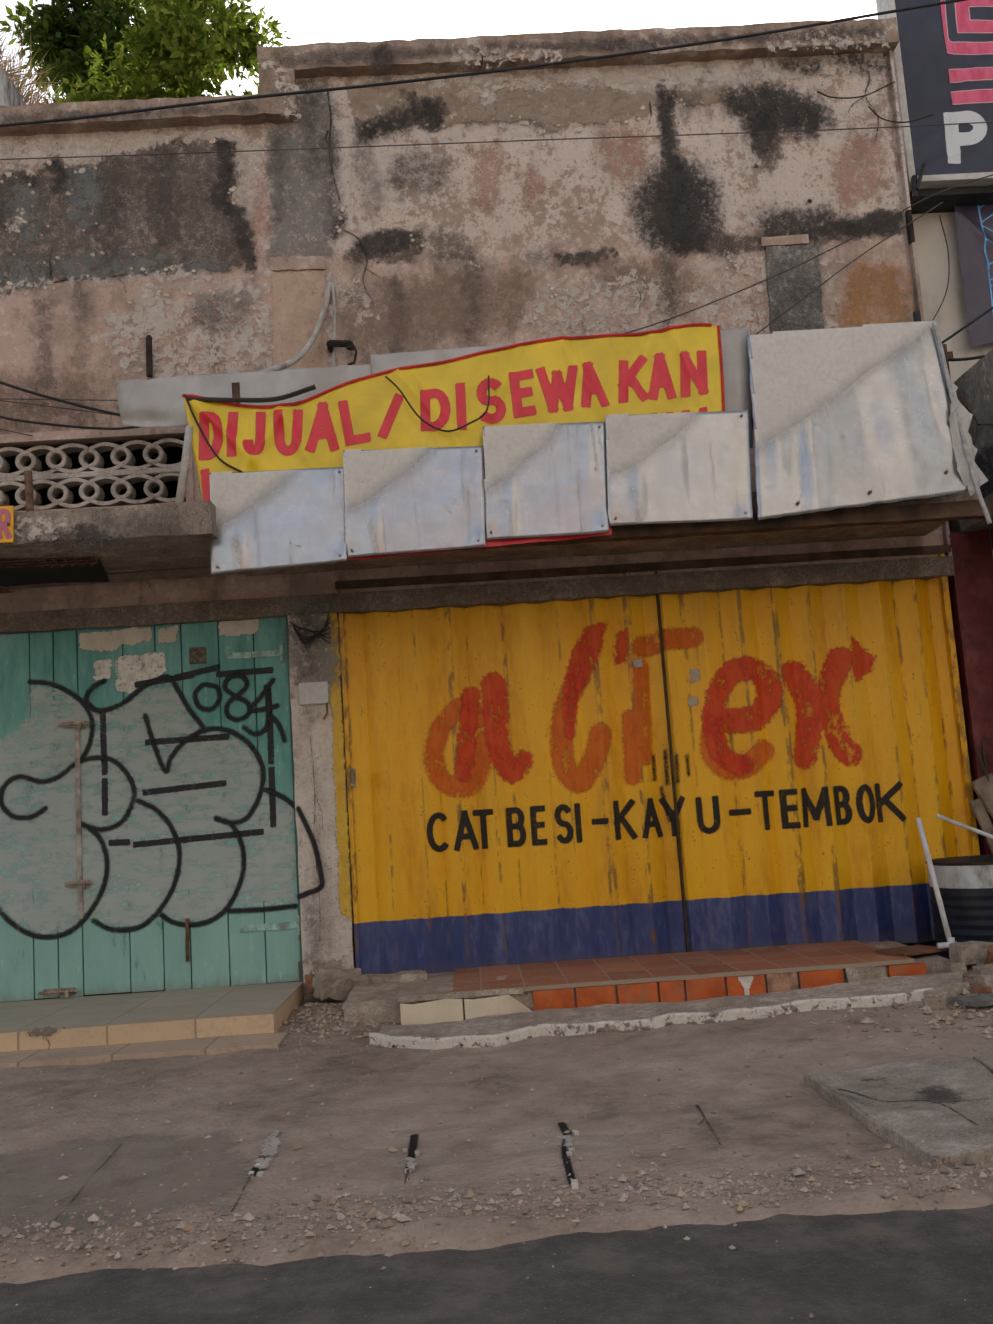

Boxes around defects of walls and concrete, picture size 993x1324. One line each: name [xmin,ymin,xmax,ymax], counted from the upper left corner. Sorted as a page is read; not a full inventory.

peeling [261,60,301,119]
damp [358,90,448,143]
damp [281,24,885,70]
peeling [346,31,890,208]
damp [0,80,424,294]
damp [554,80,903,308]
damp [340,271,534,360]